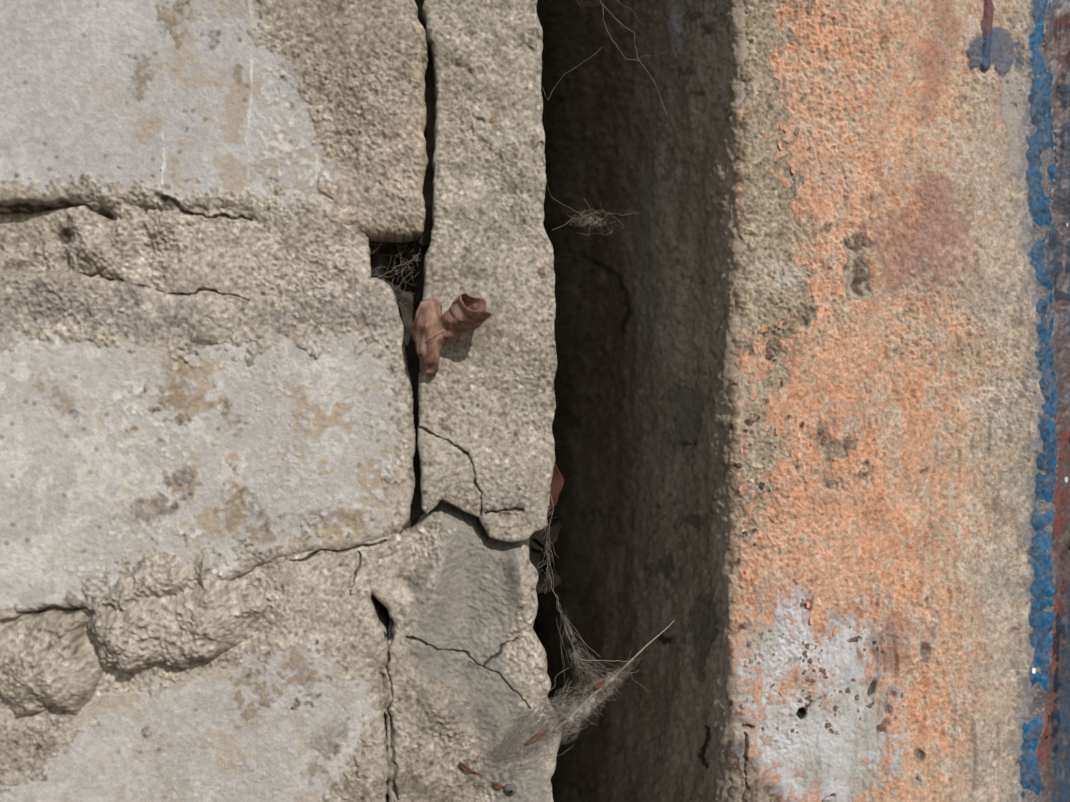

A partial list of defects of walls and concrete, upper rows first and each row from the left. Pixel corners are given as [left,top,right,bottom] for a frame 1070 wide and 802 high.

crack [415,0,436,246]
crack [164,199,252,221]
peeling [728,0,831,564]
peeling [843,231,872,301]
crack [299,292,522,580]
peeling [810,412,857,487]
rust [1052,424,1070,536]
crack [388,627,502,668]
peeling [728,581,926,802]
crack [387,705,398,798]